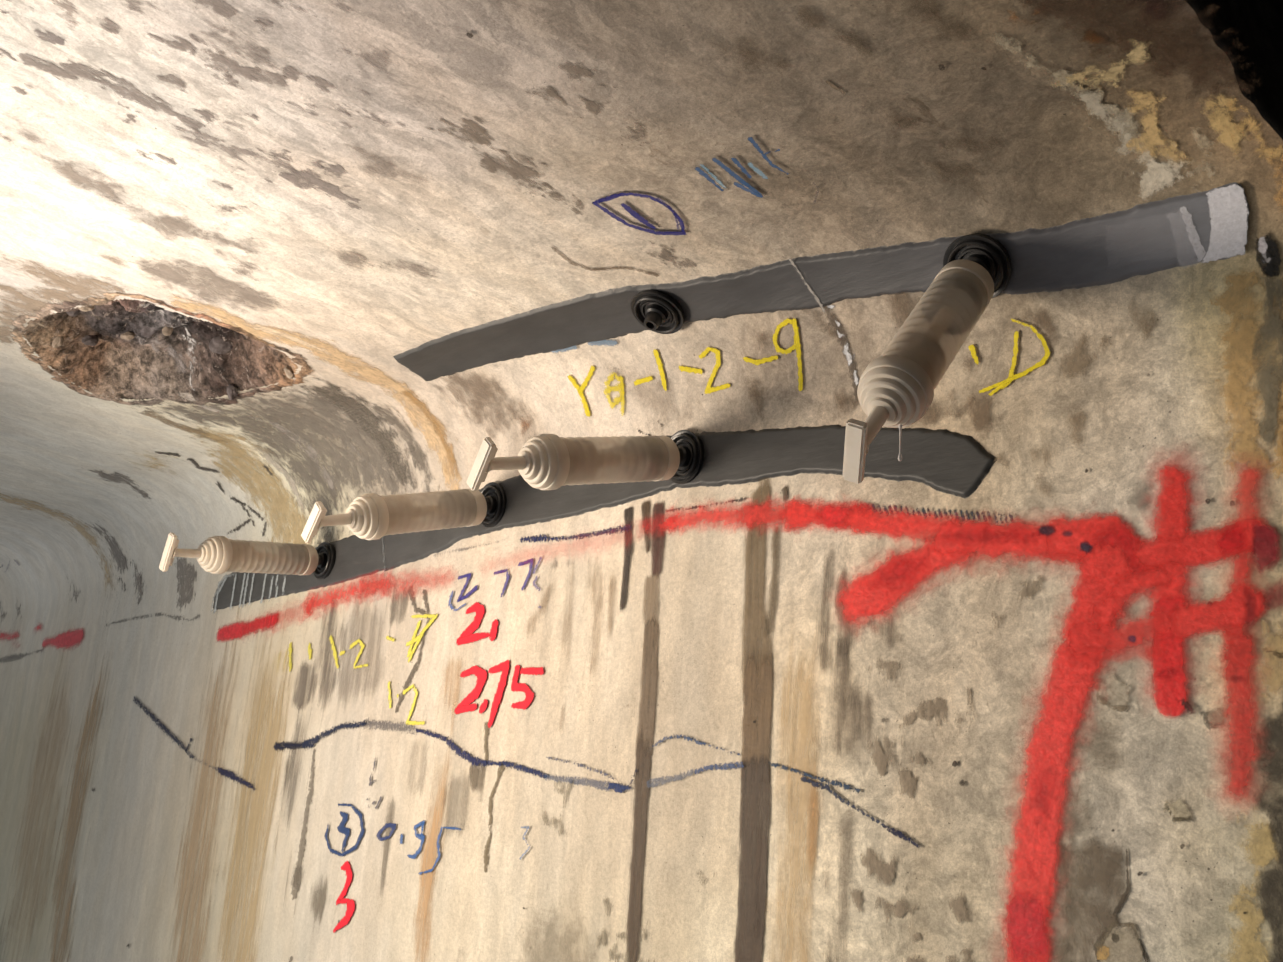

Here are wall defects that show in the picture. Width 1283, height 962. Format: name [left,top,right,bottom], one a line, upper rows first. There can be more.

corrosion [1012,0,1247,93]
spalling [12,292,313,406]
crack [823,305,859,402]
water stain [593,501,664,962]
water stain [734,479,787,962]